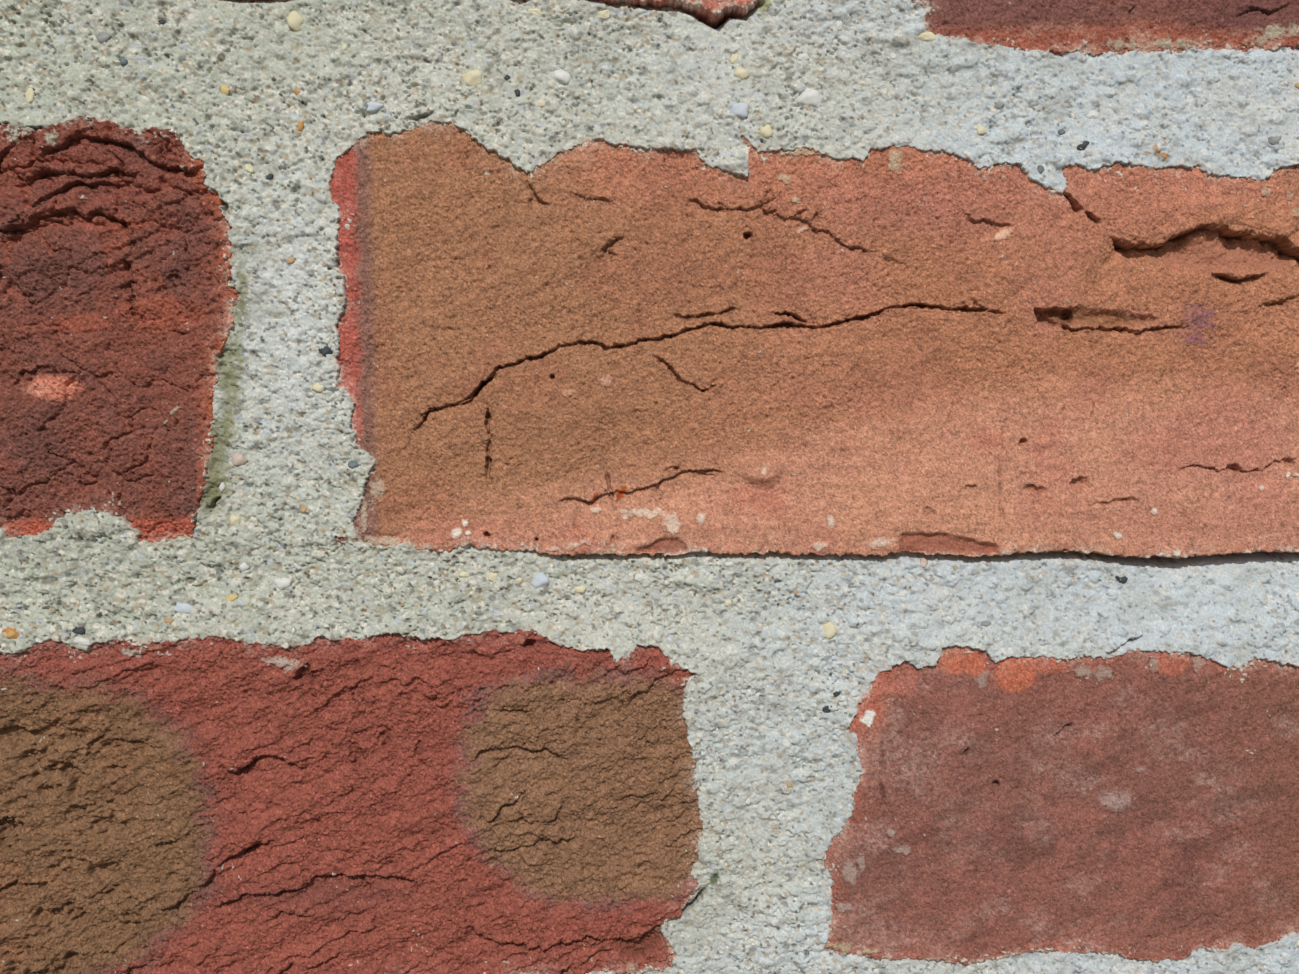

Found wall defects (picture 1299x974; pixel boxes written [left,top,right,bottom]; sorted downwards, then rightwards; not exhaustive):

crack [1060,191,1299,310]
crack [1042,311,1182,338]
crack [412,299,1007,484]
crack [556,462,728,548]